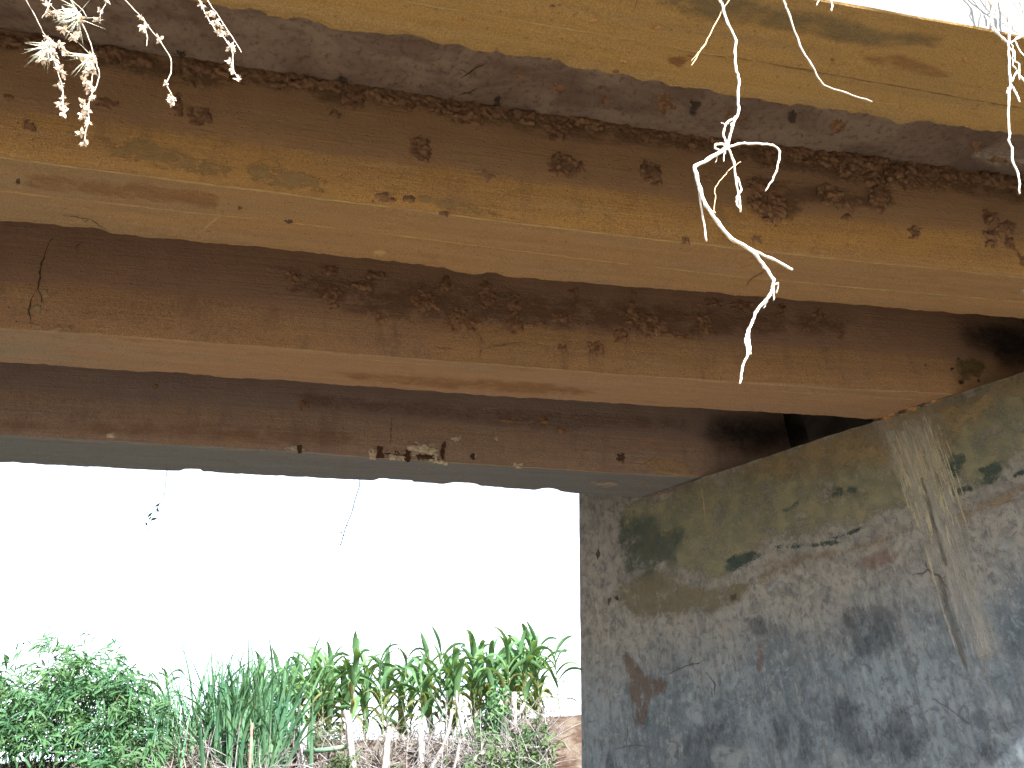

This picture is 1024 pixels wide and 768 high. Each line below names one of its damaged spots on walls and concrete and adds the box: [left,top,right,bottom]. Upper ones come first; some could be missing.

crack [28,215,105,334]
spalling [368,435,462,466]
damp [618,570,748,616]
corrosion [624,654,667,724]